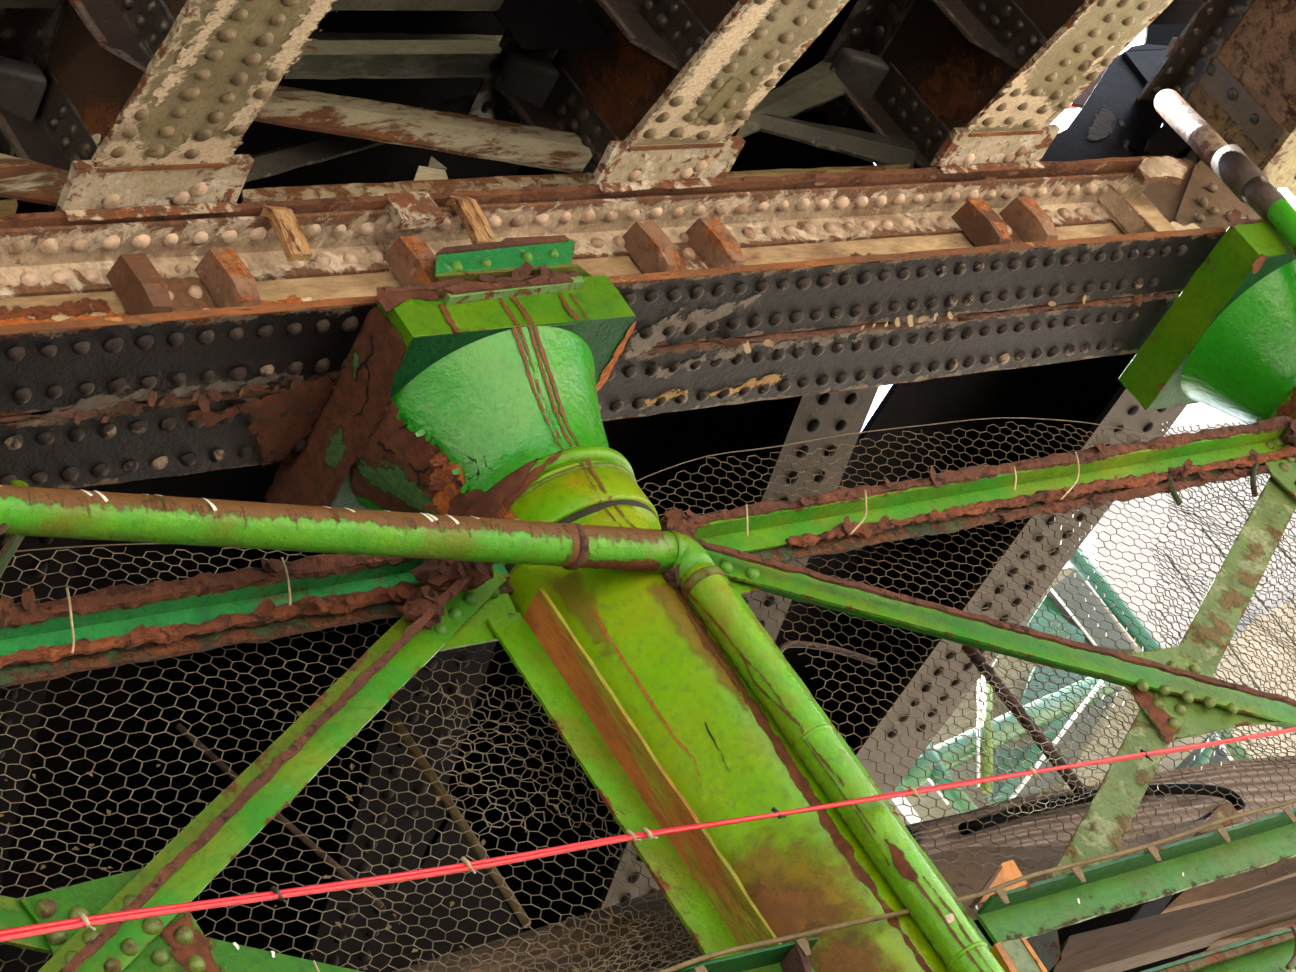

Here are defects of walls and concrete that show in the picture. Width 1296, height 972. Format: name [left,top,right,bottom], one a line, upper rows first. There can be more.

peeling [91,0,337,167]
peeling [41,369,306,424]
peeling [622,293,968,379]
rust [0,273,994,972]
rust [694,535,1296,707]
rust [1131,686,1180,742]